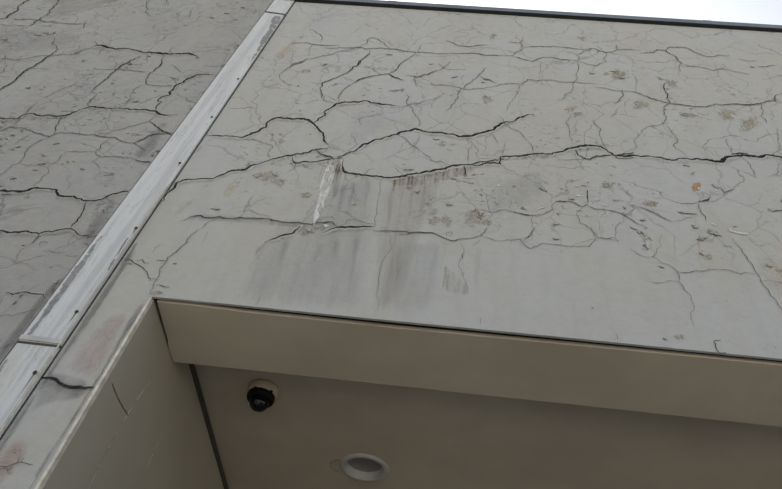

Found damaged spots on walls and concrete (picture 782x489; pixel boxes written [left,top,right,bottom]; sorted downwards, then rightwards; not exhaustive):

crack [0,0,216,262]
water stain [312,165,335,225]
crack [128,30,782,320]
crack [0,286,49,316]
crack [41,377,93,389]